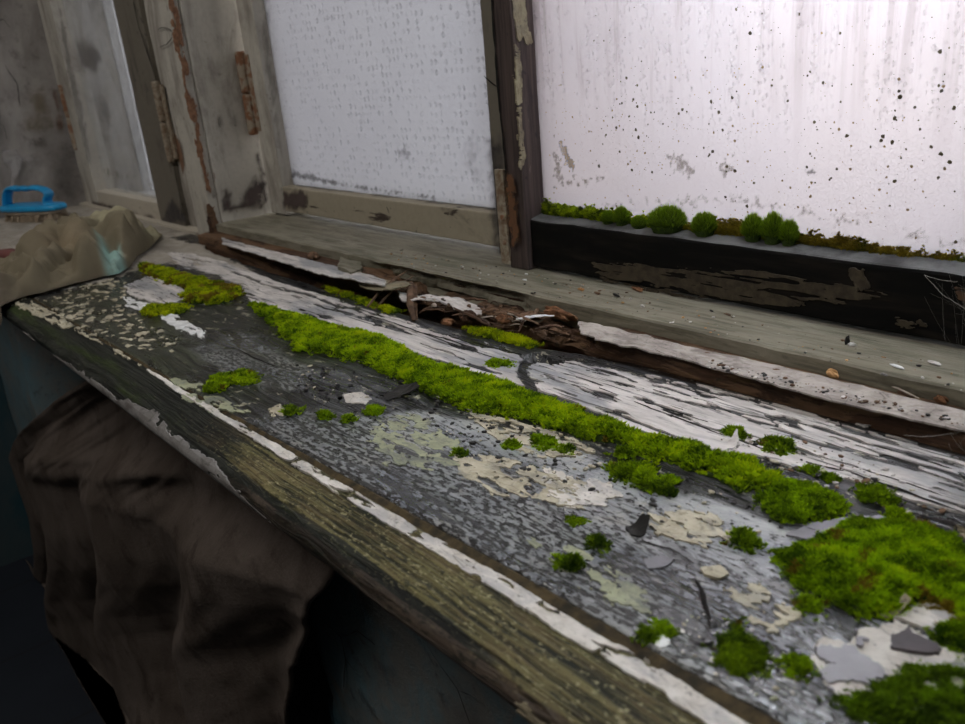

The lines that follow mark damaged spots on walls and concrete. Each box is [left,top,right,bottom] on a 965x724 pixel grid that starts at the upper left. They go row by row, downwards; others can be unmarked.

damp [549,96,771,193]
damp [868,74,954,227]
peeling [221,238,482,315]
peeling [168,252,965,541]
peeling [6,276,748,724]
peeling [700,565,802,634]
peeling [810,593,965,697]